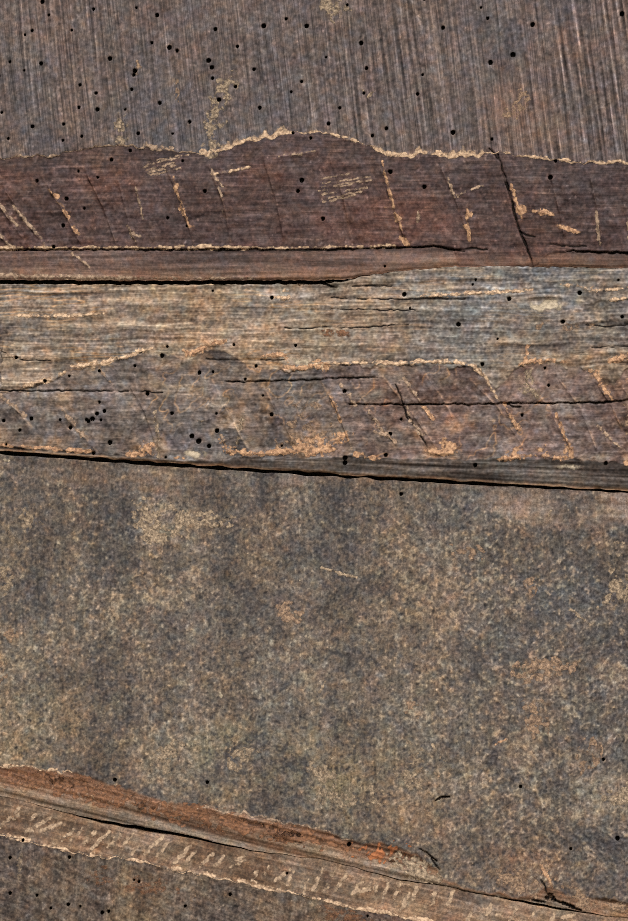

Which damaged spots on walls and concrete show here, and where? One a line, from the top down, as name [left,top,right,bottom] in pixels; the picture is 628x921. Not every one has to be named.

crack [489,148,628,261]
crack [533,880,582,911]